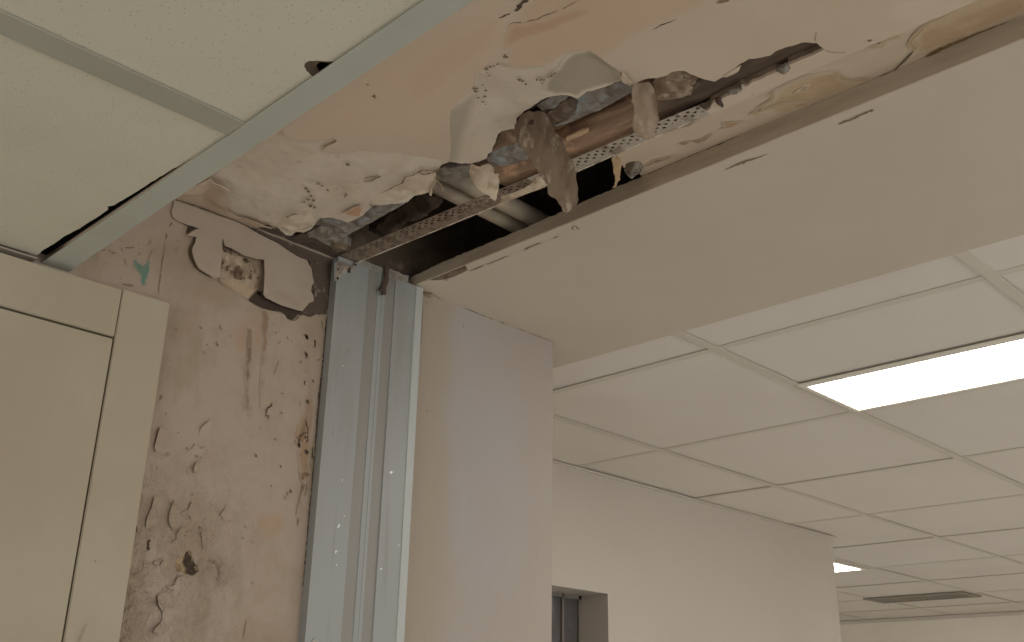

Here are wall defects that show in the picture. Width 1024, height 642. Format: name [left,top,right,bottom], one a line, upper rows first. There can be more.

leakage [869,0,1024,71]
spalling [652,71,700,100]
leakage [750,70,879,116]
peeling [171,51,633,321]
leakage [223,309,269,360]
spalling [175,551,199,576]